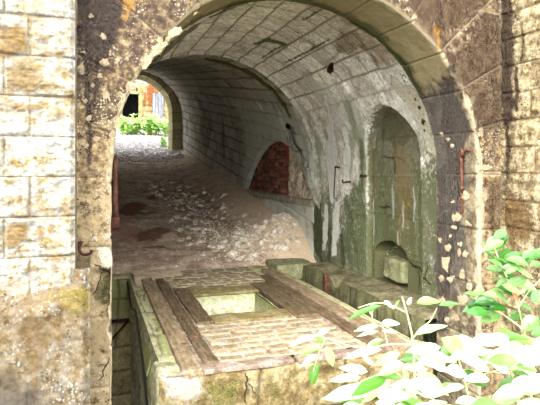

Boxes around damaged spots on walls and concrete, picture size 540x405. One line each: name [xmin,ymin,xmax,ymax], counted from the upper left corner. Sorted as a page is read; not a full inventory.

spalling [141,27,182,69]
leakage [77,0,125,165]
spalling [114,79,138,139]
peeling [438,213,472,306]
spalling [93,236,133,405]
peeling [439,296,459,324]
crack [244,373,255,404]